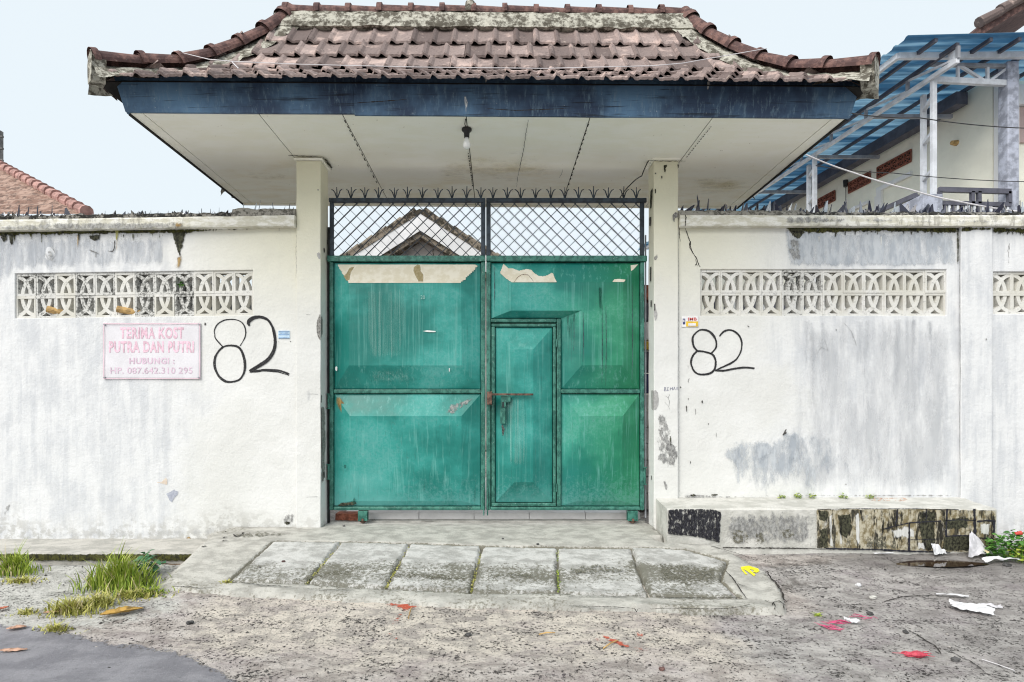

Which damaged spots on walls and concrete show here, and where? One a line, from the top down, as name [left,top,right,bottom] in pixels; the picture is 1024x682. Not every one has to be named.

leakage [0,222,185,275]
crack [678,215,699,280]
leakage [787,217,955,266]
leakage [726,434,830,482]
leakage [727,510,995,551]